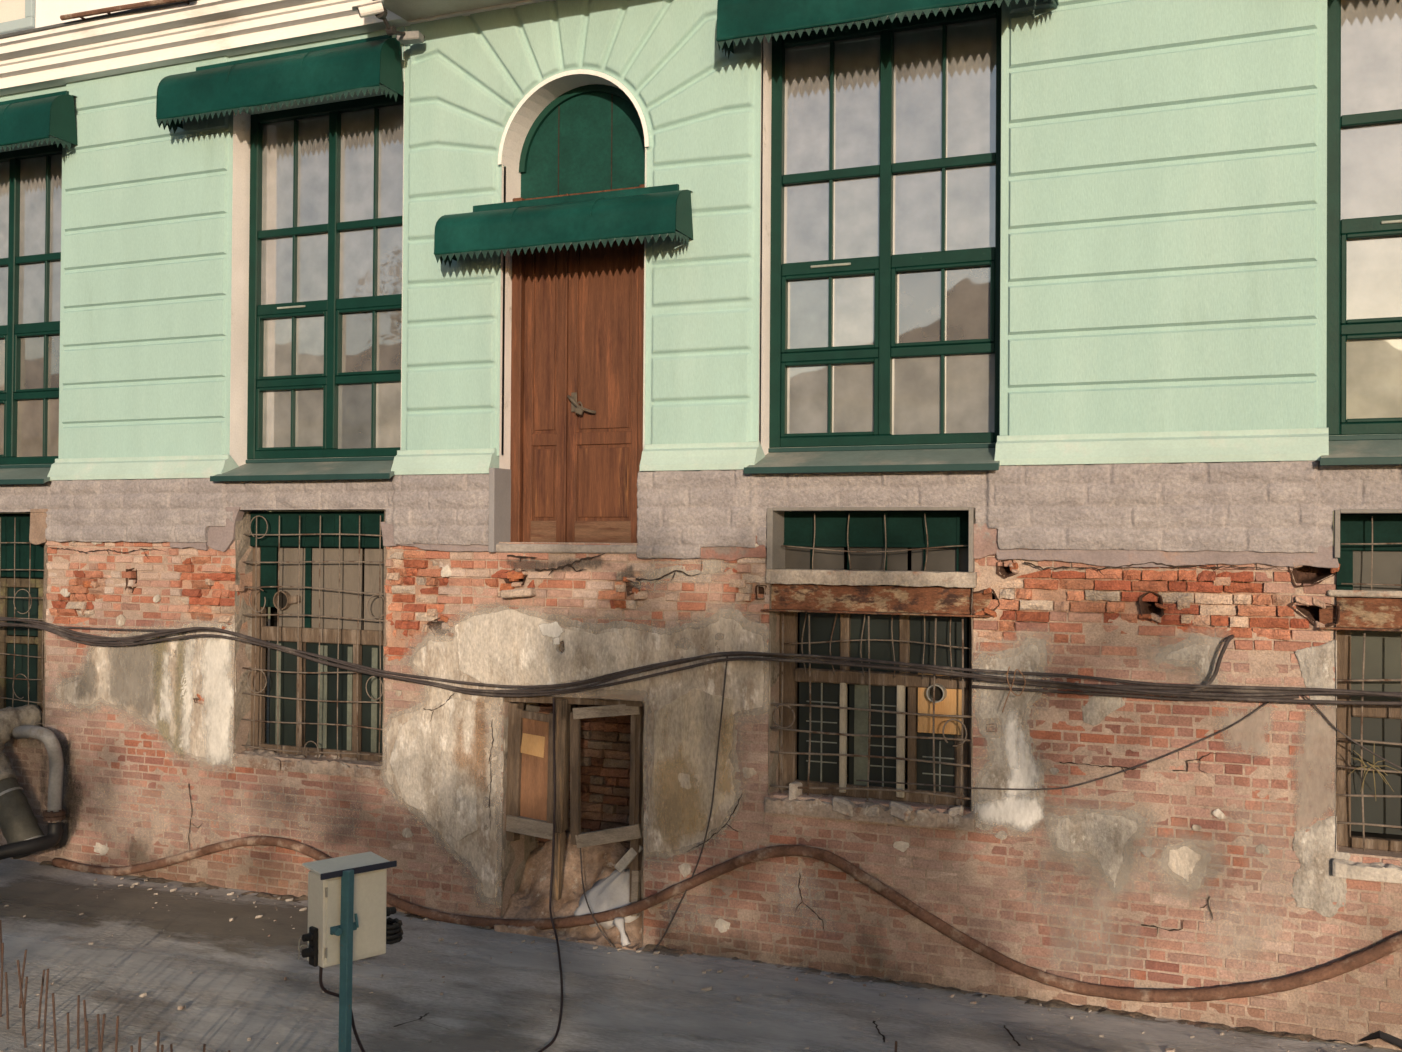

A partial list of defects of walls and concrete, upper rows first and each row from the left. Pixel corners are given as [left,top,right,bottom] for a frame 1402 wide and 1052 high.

flaking render [49,556,245,769]
flaking render [379,550,771,906]
crack [795,873,824,929]
spalling [832,796,929,822]
flaking render [893,841,909,852]
damp [975,712,1043,830]
spalling [947,559,1340,894]
flaking render [1291,815,1351,918]